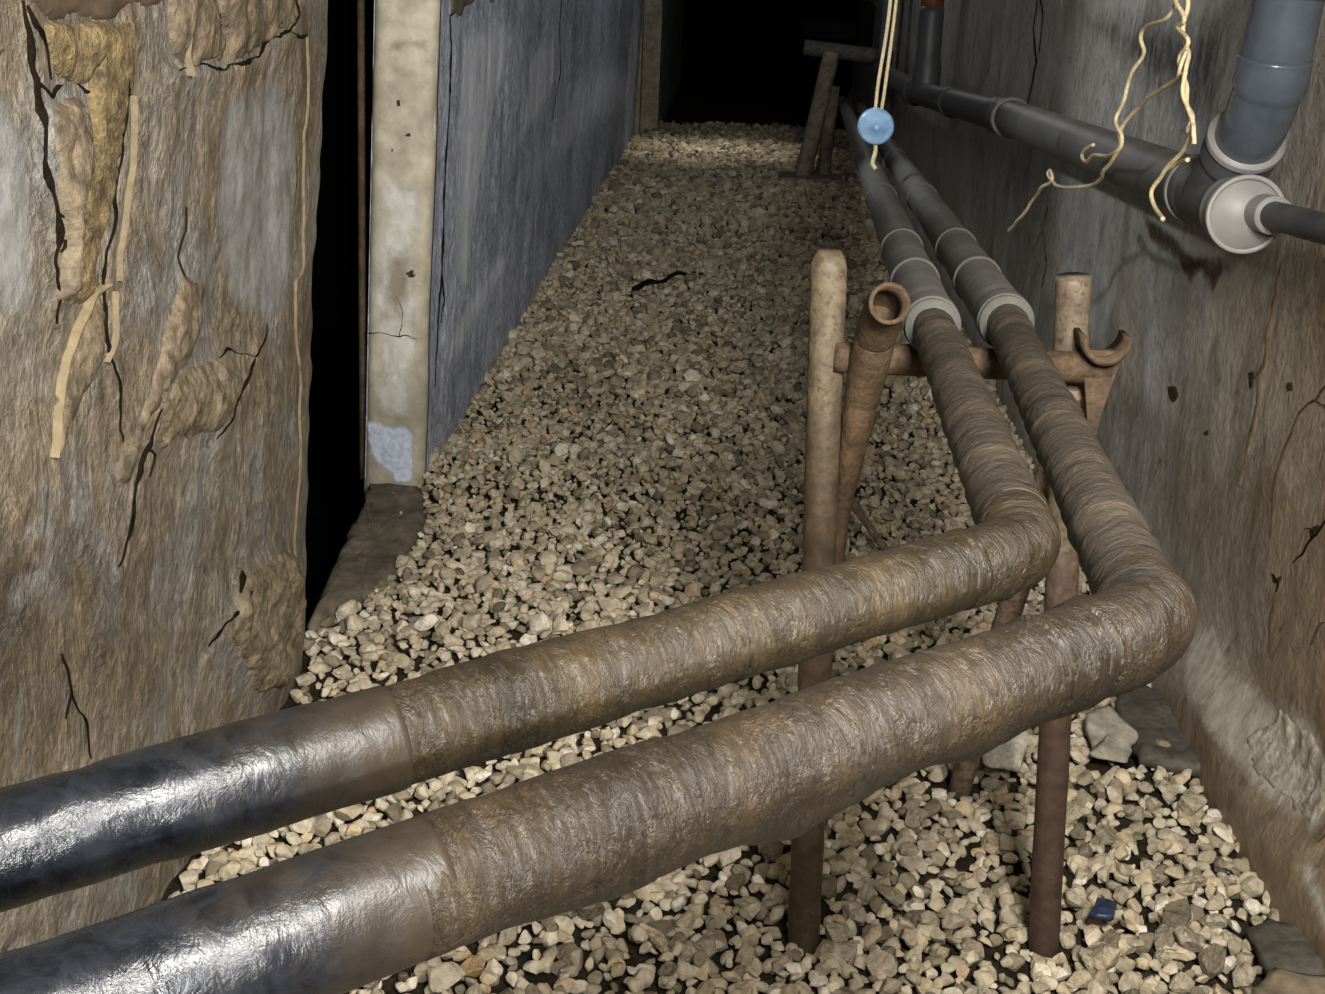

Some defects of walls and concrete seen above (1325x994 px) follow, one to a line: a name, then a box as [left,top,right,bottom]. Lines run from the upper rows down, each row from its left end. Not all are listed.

crack [179,0,308,71]
peeling [450,0,494,18]
crack [21,0,90,324]
spalling [32,0,296,453]
crack [101,81,164,567]
crack [217,324,268,439]
crack [1238,261,1325,537]
crack [1269,520,1325,653]
crack [61,654,92,758]